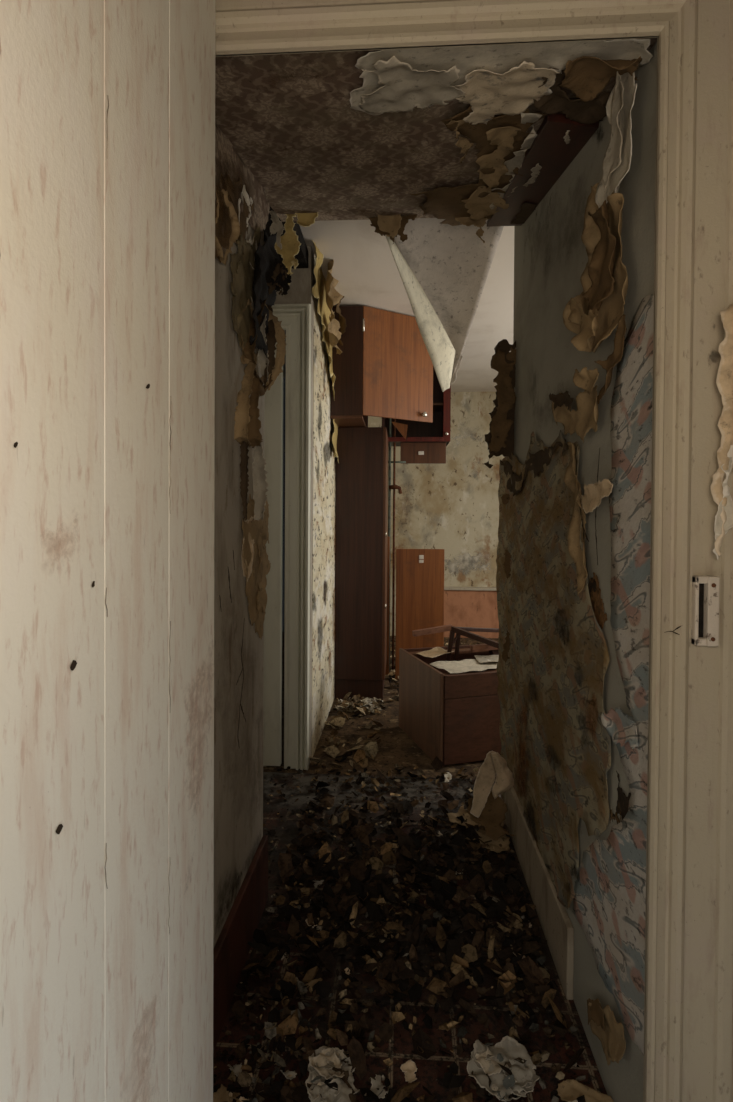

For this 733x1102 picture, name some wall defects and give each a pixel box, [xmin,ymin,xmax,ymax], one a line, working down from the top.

peeling [350,39,653,125]
spalling [588,572,607,629]
spalling [610,771,631,824]